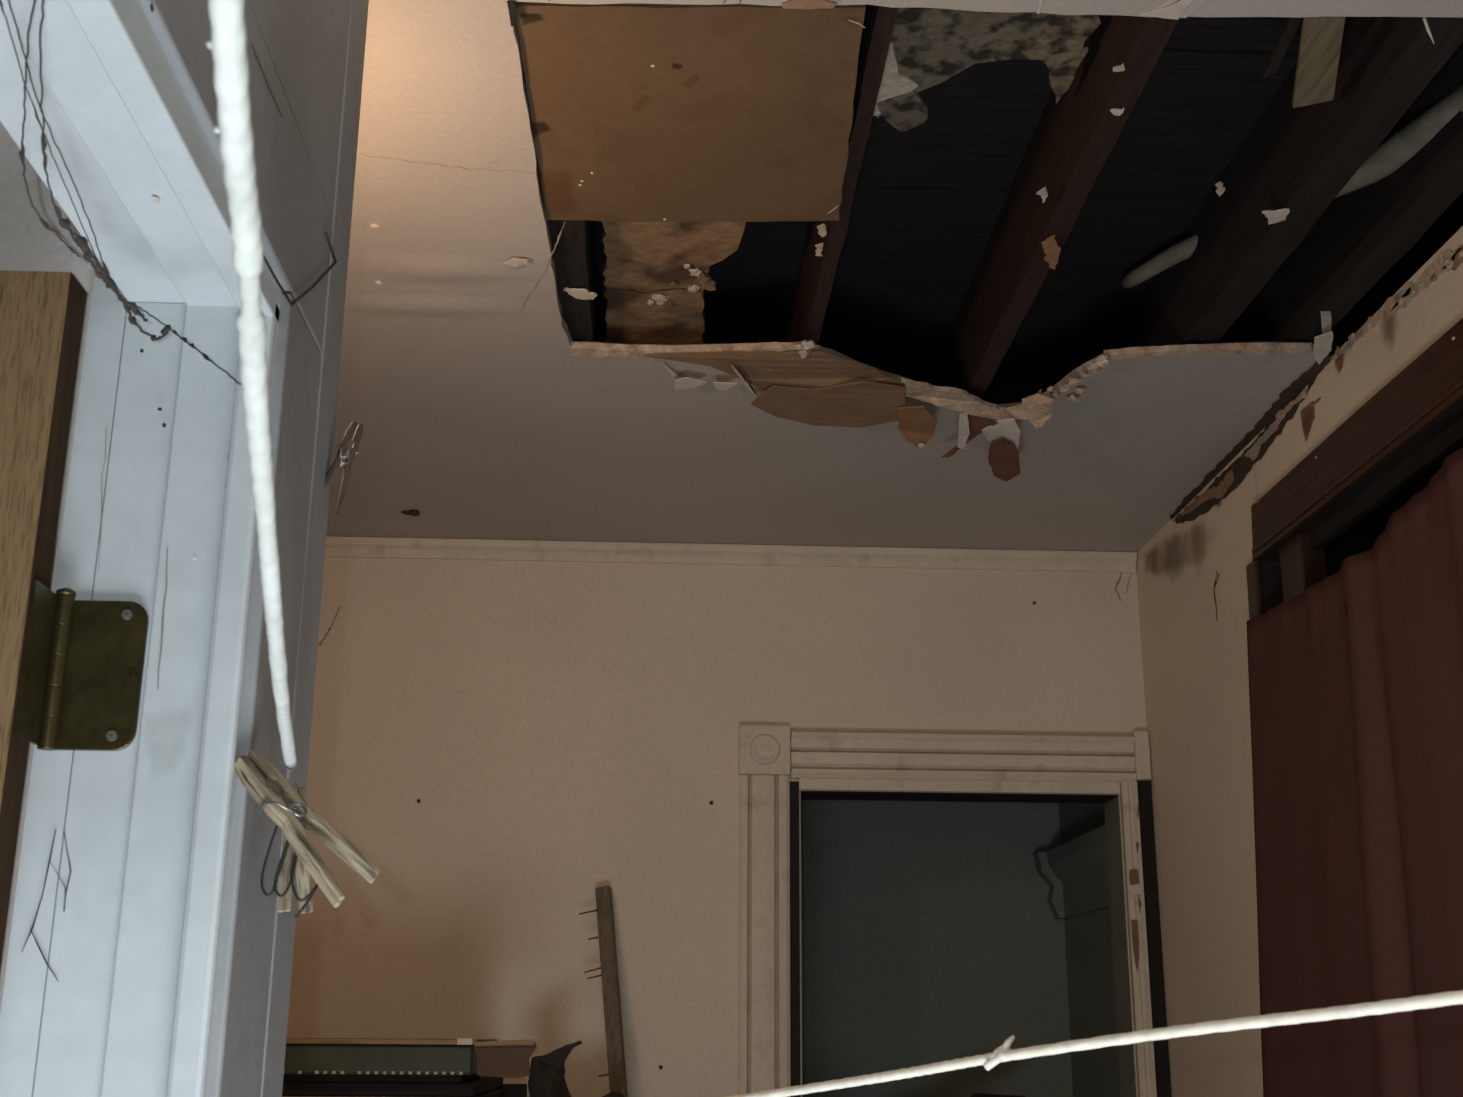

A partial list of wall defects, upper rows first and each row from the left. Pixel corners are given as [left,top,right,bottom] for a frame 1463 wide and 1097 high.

spalling [507,1,517,27]
spalling [781,0,837,9]
peeling [1329,245,1463,363]
spalling [570,340,1310,482]
crack [21,829,71,982]